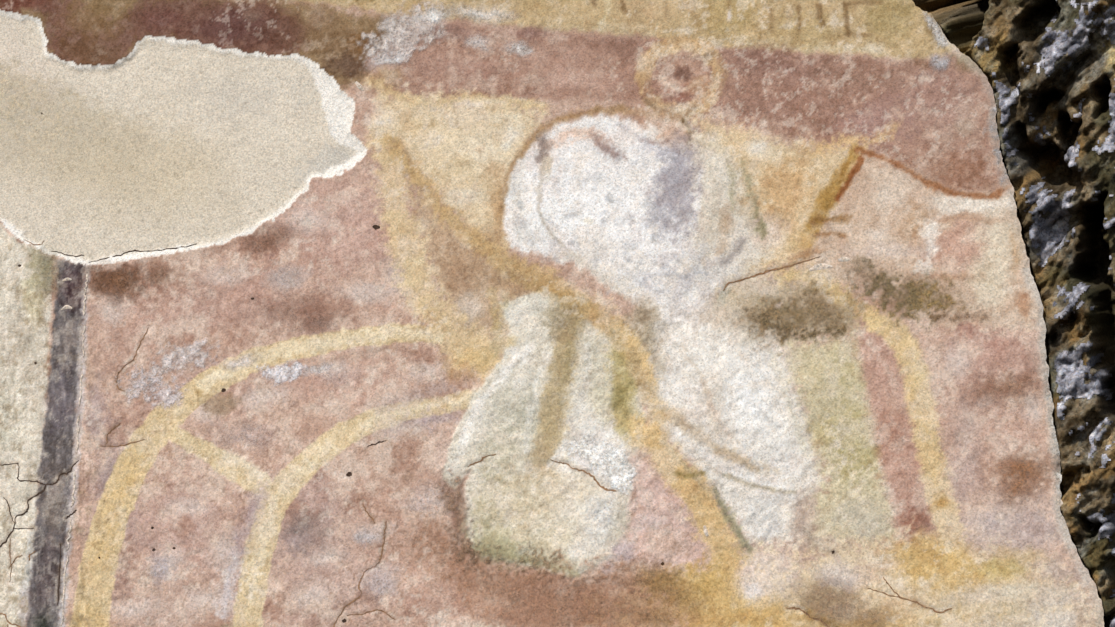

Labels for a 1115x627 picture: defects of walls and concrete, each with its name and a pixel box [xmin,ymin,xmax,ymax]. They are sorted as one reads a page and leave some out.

flaking render [0,10,367,357]
crack [116,327,149,391]
peeling [126,339,208,407]
peeling [227,356,327,383]
crack [106,423,144,447]
crack [550,459,616,491]
crack [0,460,79,605]
peeling [61,472,76,627]
crack [333,506,394,627]
crack [868,577,952,613]